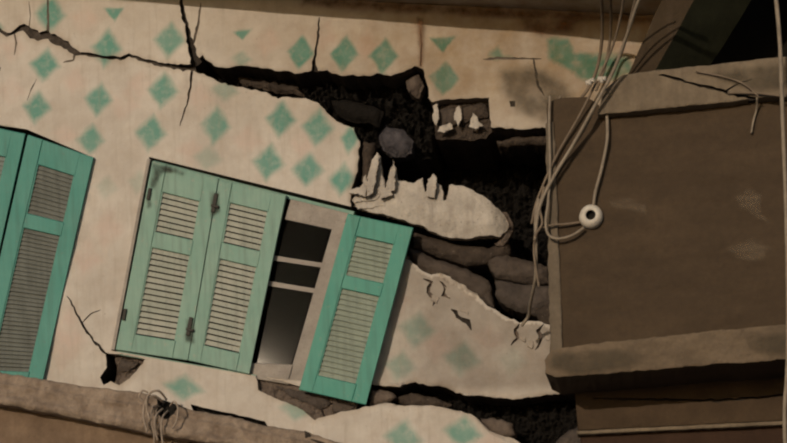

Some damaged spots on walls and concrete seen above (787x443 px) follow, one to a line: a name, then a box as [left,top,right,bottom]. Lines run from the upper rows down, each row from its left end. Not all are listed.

crack [0,0,435,184]
crack [483,57,545,96]
crack [659,74,756,100]
spalling [432,98,492,141]
flaking render [349,153,514,247]
flaking render [423,273,451,306]
crack [67,296,106,354]
flaking render [451,309,472,330]
flaking render [511,323,550,350]
spalling [256,377,358,420]